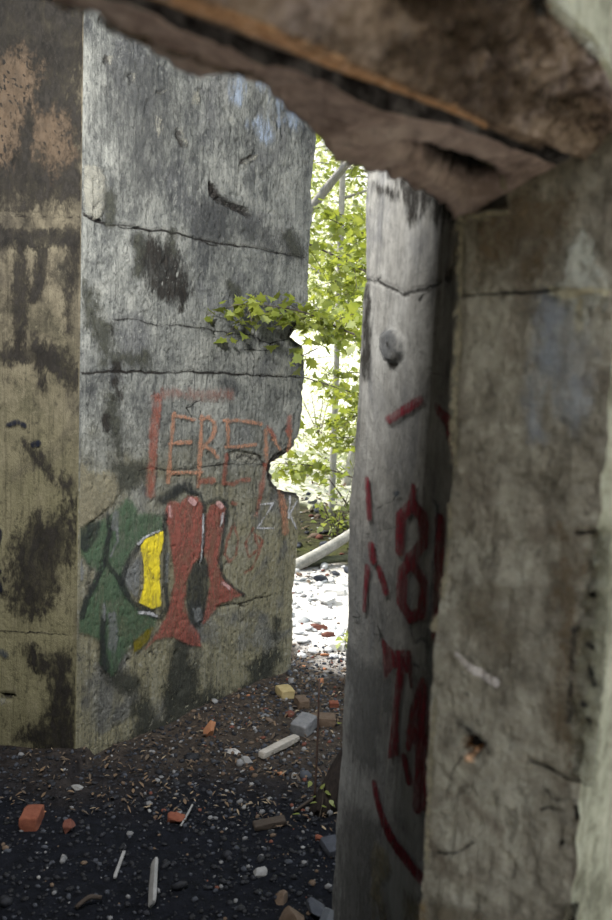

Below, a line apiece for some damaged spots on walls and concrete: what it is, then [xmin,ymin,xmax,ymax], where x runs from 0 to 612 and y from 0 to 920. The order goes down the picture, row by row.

peeling [546,0,605,59]
spalling [425,142,507,190]
crack [16,206,304,258]
crack [111,318,286,351]
crack [81,367,301,378]
spalling [228,442,298,497]